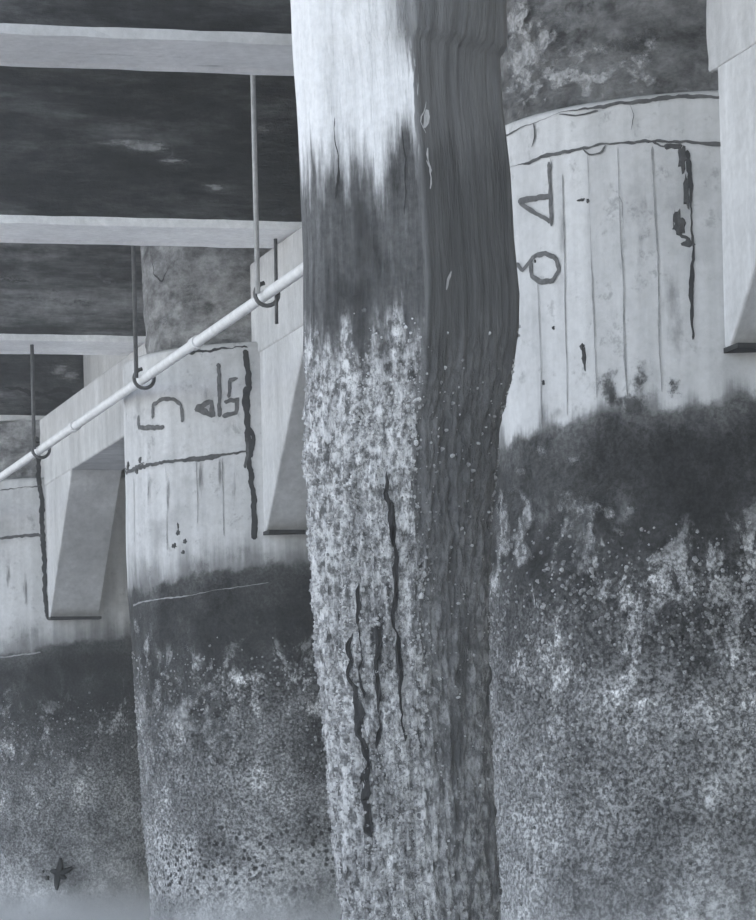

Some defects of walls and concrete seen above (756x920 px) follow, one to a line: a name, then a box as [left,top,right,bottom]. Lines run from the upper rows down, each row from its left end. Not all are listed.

crack [506,94,721,414]
crack [0,436,49,620]
crack [125,345,258,540]
damp [602,368,646,414]